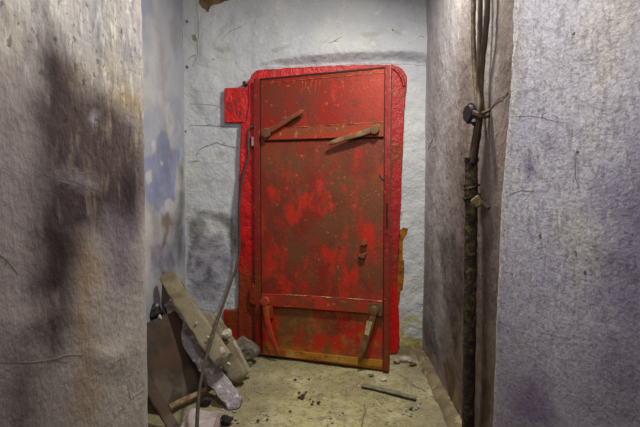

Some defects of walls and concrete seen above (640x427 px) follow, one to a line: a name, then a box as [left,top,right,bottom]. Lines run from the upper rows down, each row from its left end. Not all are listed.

flaking render [196,0,240,15]
crack [192,124,238,162]
crack [518,113,580,187]
damp [0,0,239,427]